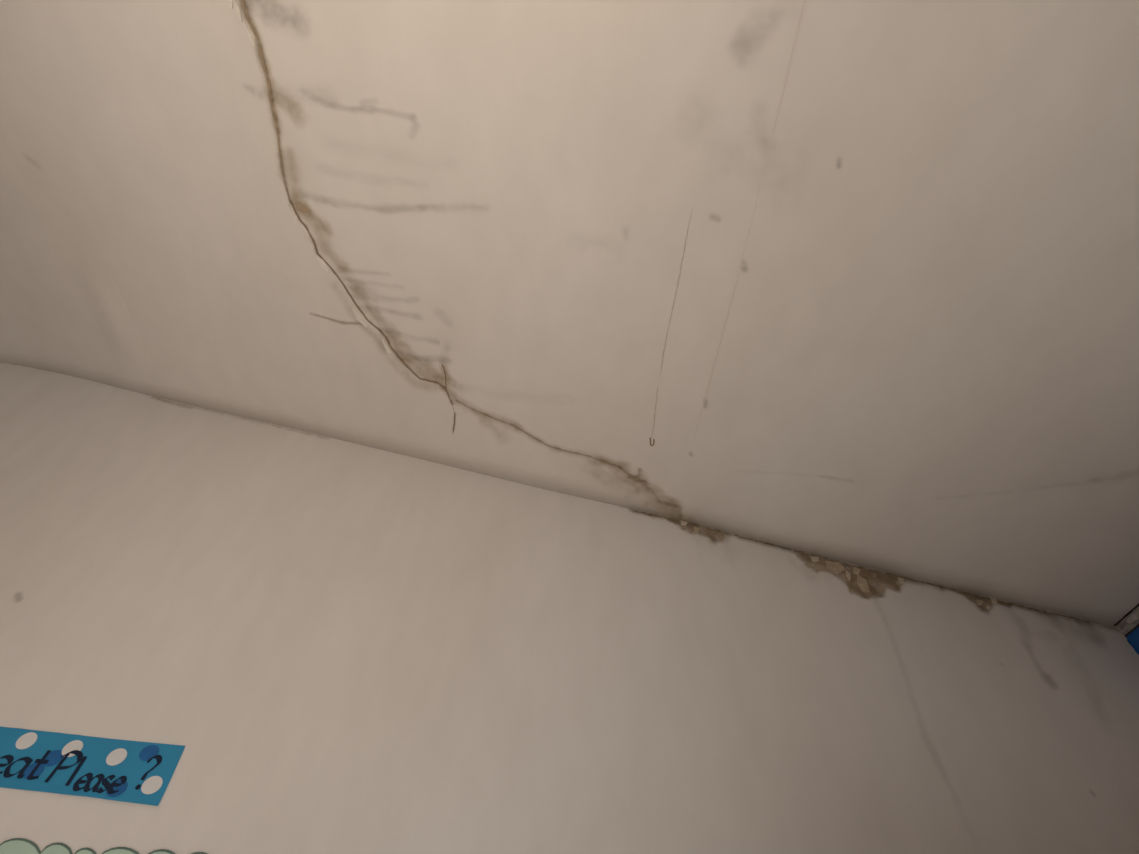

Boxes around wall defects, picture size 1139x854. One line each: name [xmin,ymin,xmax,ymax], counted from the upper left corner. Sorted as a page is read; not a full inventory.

crack [227,0,1118,628]
flaking render [797,553,905,597]